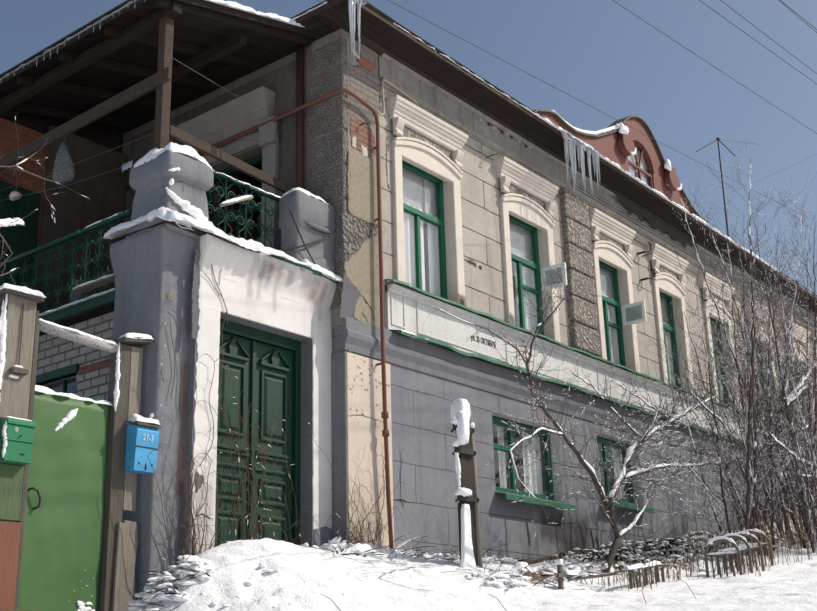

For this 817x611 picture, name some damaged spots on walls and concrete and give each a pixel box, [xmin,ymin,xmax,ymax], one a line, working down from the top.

spalling [348,48,381,157]
spalling [342,212,378,255]
peeling [340,274,361,319]